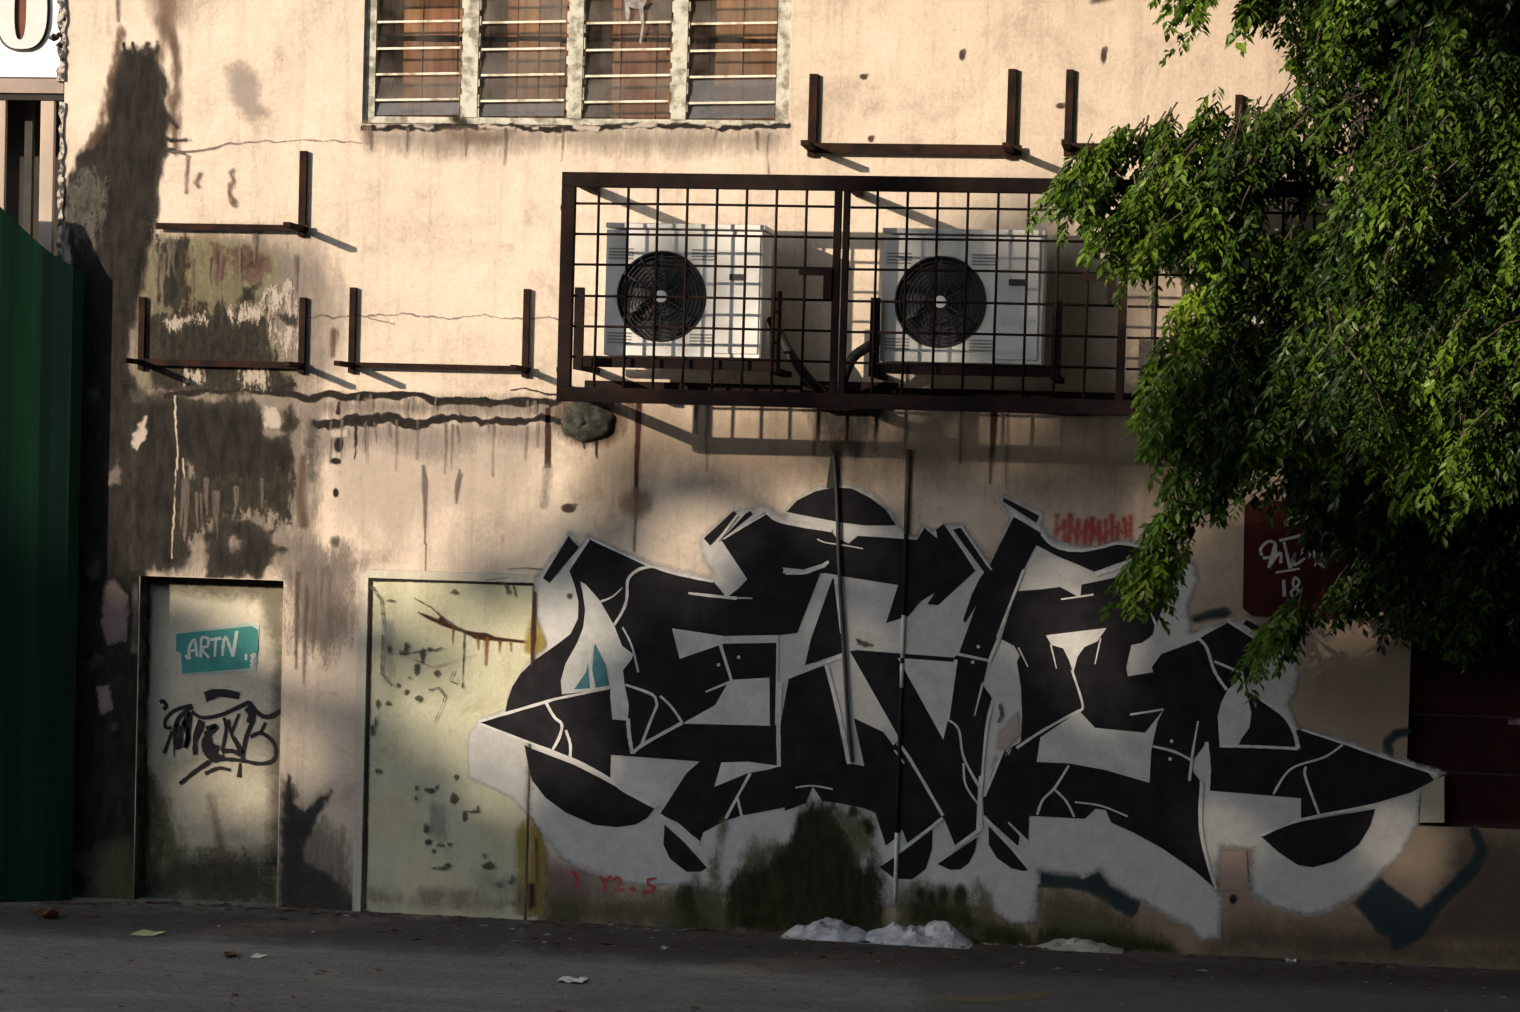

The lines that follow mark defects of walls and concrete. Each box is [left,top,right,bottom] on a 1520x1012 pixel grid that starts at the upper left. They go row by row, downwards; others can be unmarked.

water stain [58,0,569,911]
rust [416,591,546,683]